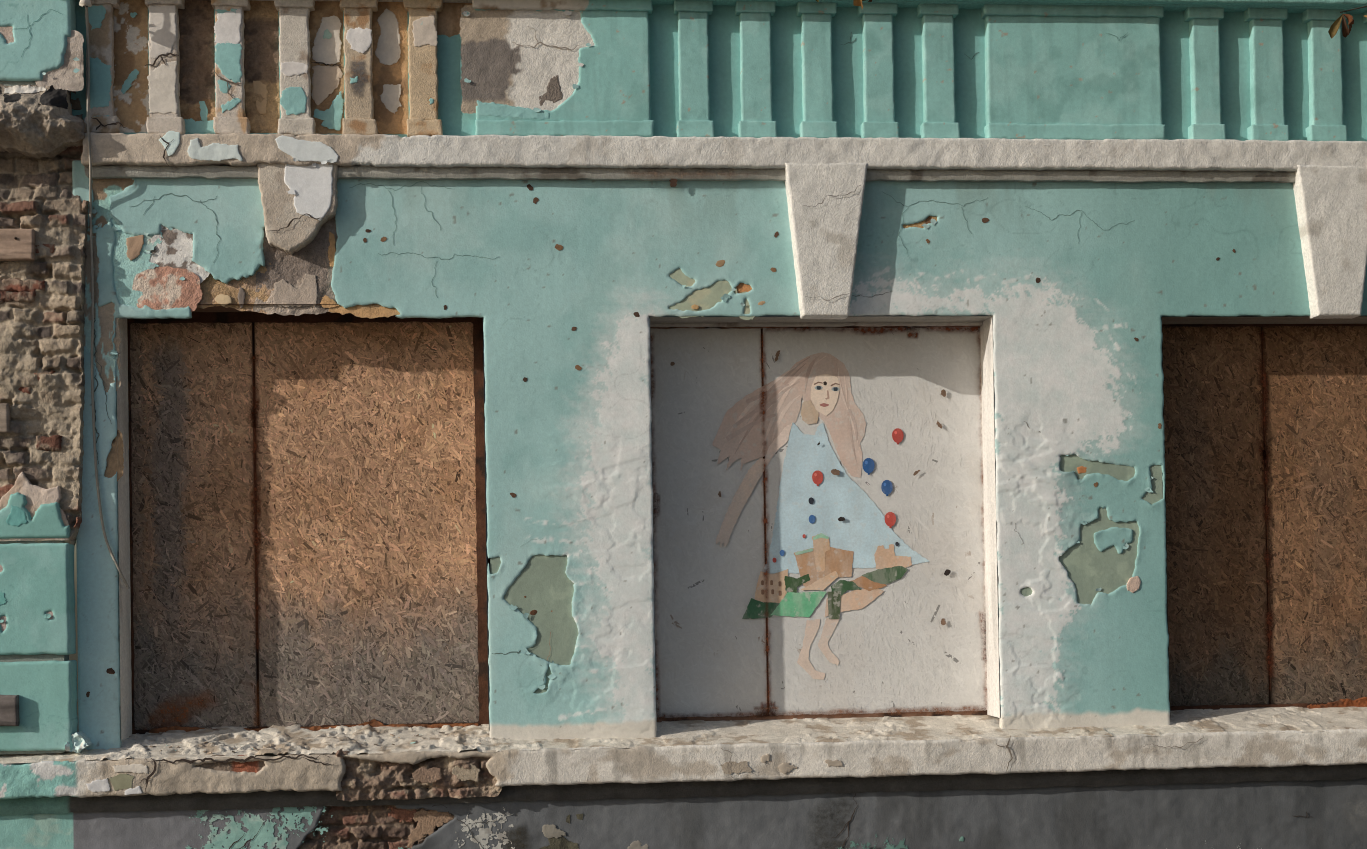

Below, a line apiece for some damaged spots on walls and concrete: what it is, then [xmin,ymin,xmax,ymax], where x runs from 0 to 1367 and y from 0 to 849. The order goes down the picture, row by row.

crack [1034,209,1135,239]
flaking render [0,0,595,546]
peeling [669,260,765,320]
peeling [1060,454,1163,505]
peeling [1059,507,1141,605]
peeling [504,554,579,694]
corrosion [148,725,218,733]
corrosion [300,719,478,731]
peeling [86,764,148,795]
flaking render [185,749,515,849]
peeling [720,754,798,774]
peeling [539,813,583,849]